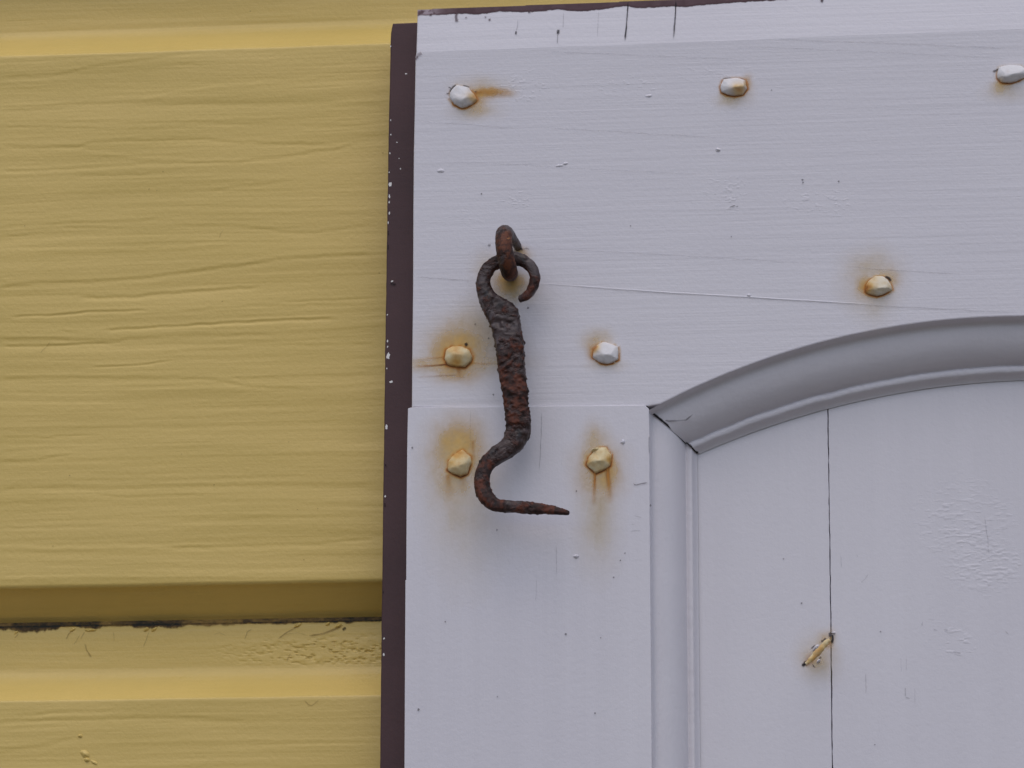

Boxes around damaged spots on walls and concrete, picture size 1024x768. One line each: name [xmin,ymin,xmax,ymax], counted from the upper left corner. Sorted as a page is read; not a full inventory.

rust [451,88,502,110]
rust [859,274,894,298]
rust [423,330,482,377]
rust [439,427,477,488]
rust [583,438,617,490]